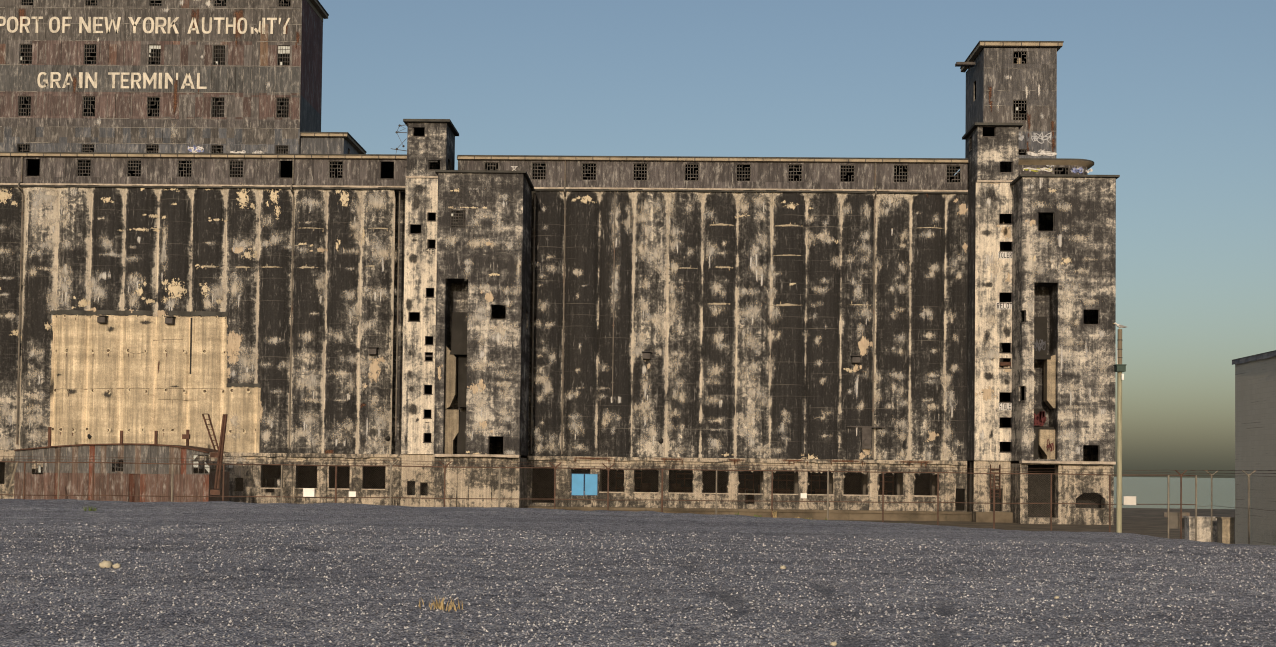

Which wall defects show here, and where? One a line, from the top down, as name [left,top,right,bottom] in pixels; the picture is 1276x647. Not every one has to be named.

peeling [0,188,17,207]
peeling [119,188,180,232]
spalling [232,246,257,259]
peeling [236,184,282,220]
damp [343,190,394,271]
damp [806,194,834,244]
damp [833,195,903,331]
damp [230,331,318,445]
damp [600,193,725,454]
damp [739,236,788,453]
spalling [844,333,873,372]
damp [848,365,959,460]